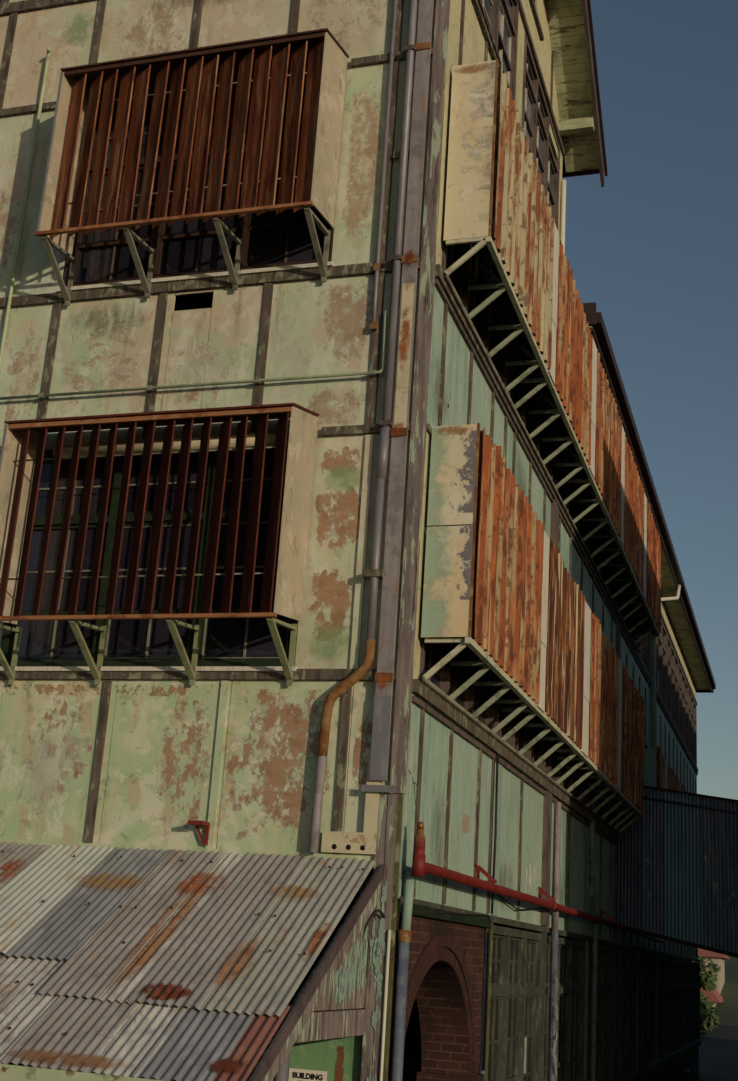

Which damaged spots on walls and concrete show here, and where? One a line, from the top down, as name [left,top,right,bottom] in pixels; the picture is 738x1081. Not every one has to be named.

peeling [4,326,43,426]
peeling [316,446,361,549]
peeling [309,568,355,643]
peeling [6,684,100,807]
peeling [115,685,213,829]
peeling [223,689,330,840]
rust [116,873,217,981]
rust [308,923,330,954]
rust [141,983,190,1001]
rust [19,1050,112,1067]
rust [209,1058,247,1074]
peeling [334,1046,345,1081]